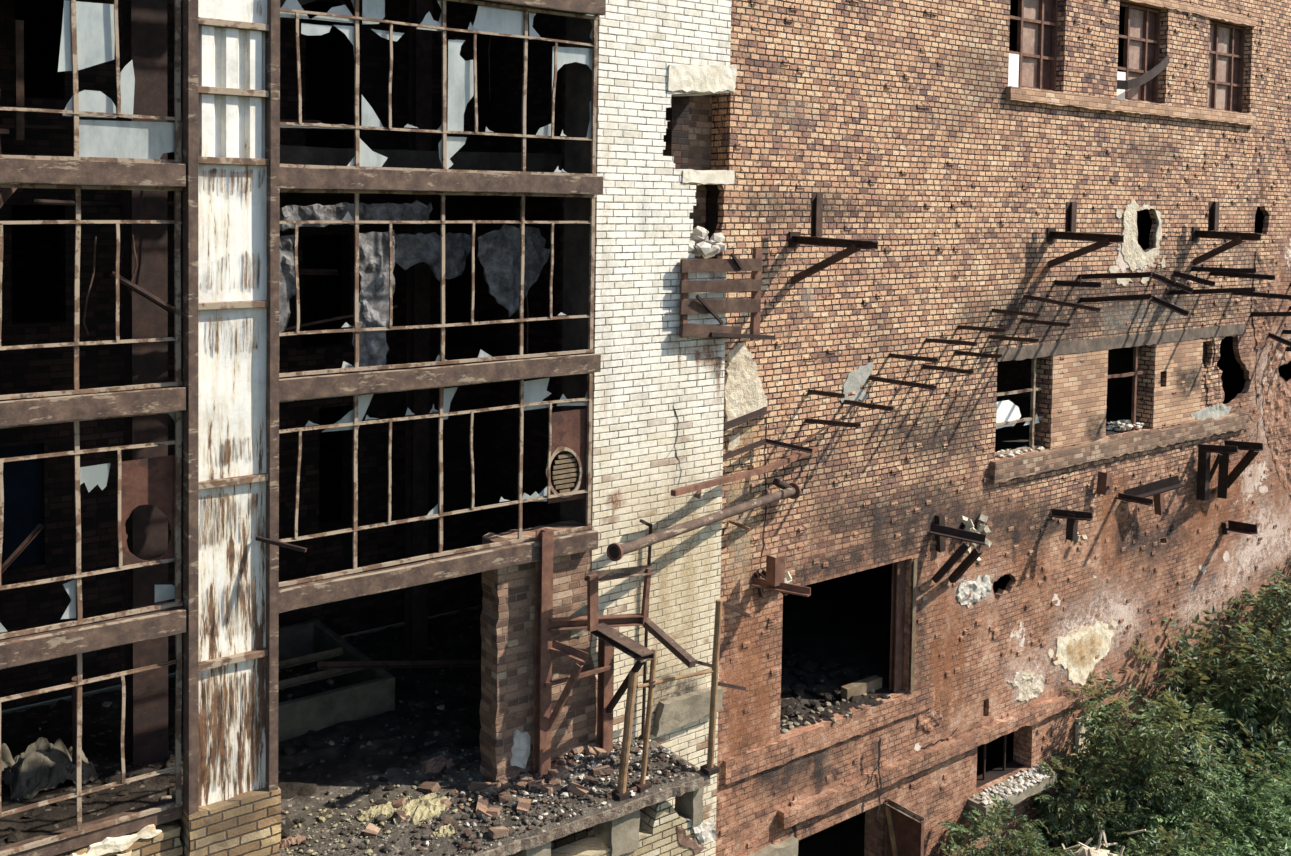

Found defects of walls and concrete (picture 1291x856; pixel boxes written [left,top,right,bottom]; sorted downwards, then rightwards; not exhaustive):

corrosion [203,168,265,200]
corrosion [199,251,261,290]
peeling [1108,265,1149,286]
corrosion [208,317,259,354]
spalling [1190,230,1291,497]
corrosion [208,437,251,465]
corrosion [204,580,255,638]
spalling [956,574,992,608]
spalling [1007,670,1044,701]
corrosion [201,672,260,788]